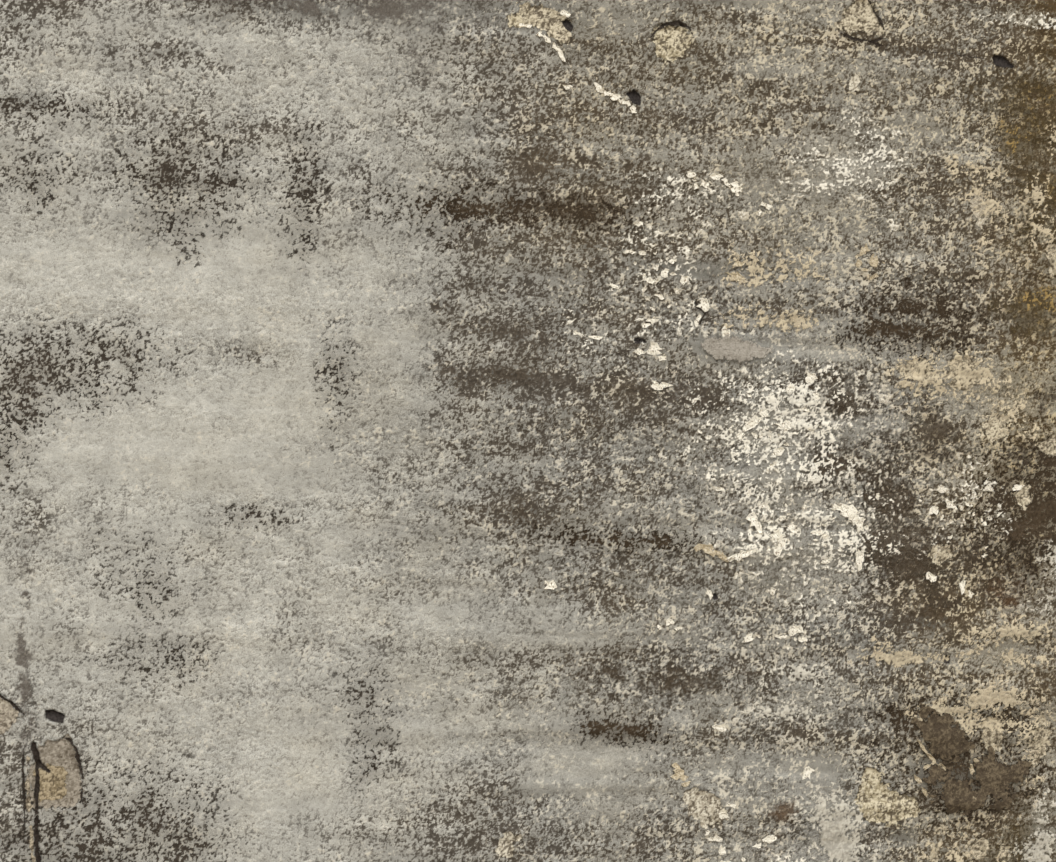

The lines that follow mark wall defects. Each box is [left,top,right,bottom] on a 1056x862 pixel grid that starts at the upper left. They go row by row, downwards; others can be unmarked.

spalling [506,2,573,62]
spalling [651,24,692,64]
spalling [834,0,887,36]
peeling [730,372,822,474]
peeling [694,501,869,572]
spalling [0,697,19,735]
crack [0,694,25,715]
spalling [980,714,1006,752]
crack [21,742,50,862]
spalling [26,733,84,812]
crack [62,737,84,801]